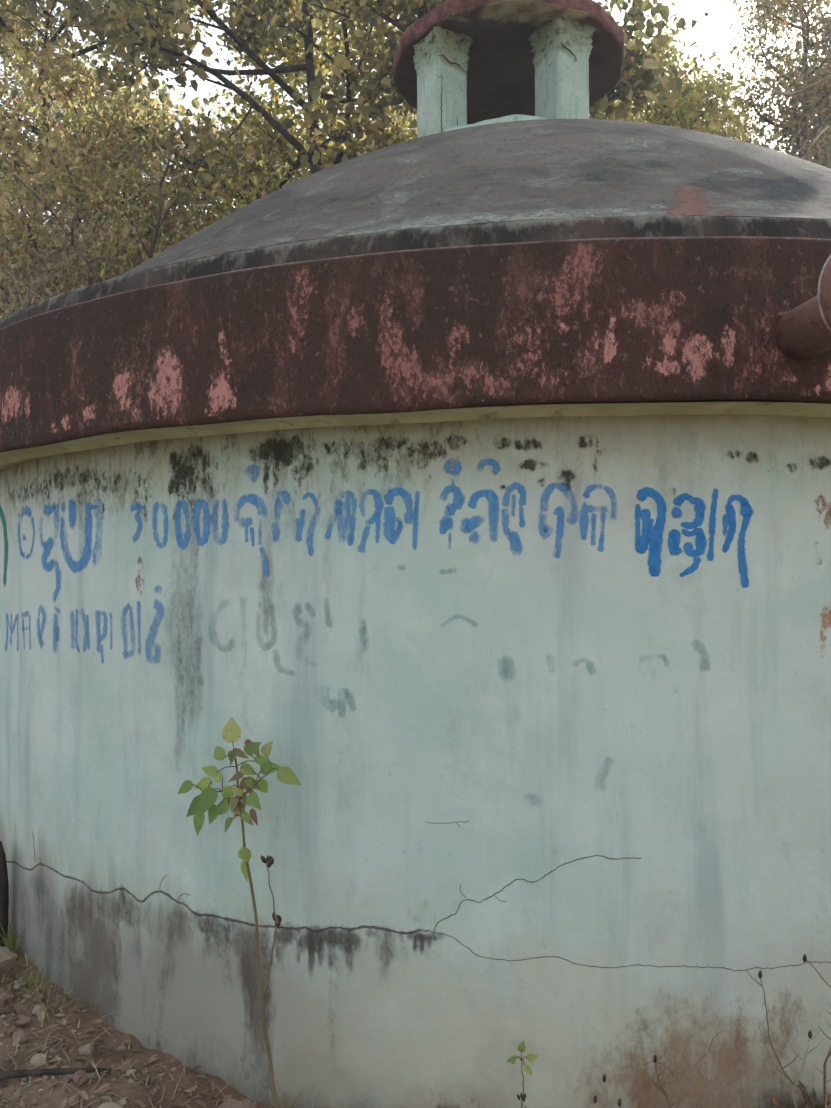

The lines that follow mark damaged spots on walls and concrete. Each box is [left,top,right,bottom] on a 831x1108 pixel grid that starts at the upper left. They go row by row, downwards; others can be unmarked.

peeling [378,243,831,401]
peeling [0,386,30,429]
peeling [109,345,183,421]
peeling [205,330,237,416]
leakage [168,444,229,519]
leakage [250,435,318,494]
leakage [325,435,467,477]
leakage [499,437,544,486]
rust [817,495,831,526]
rust [821,607,831,658]
crack [6,836,831,971]
leakage [277,928,357,968]